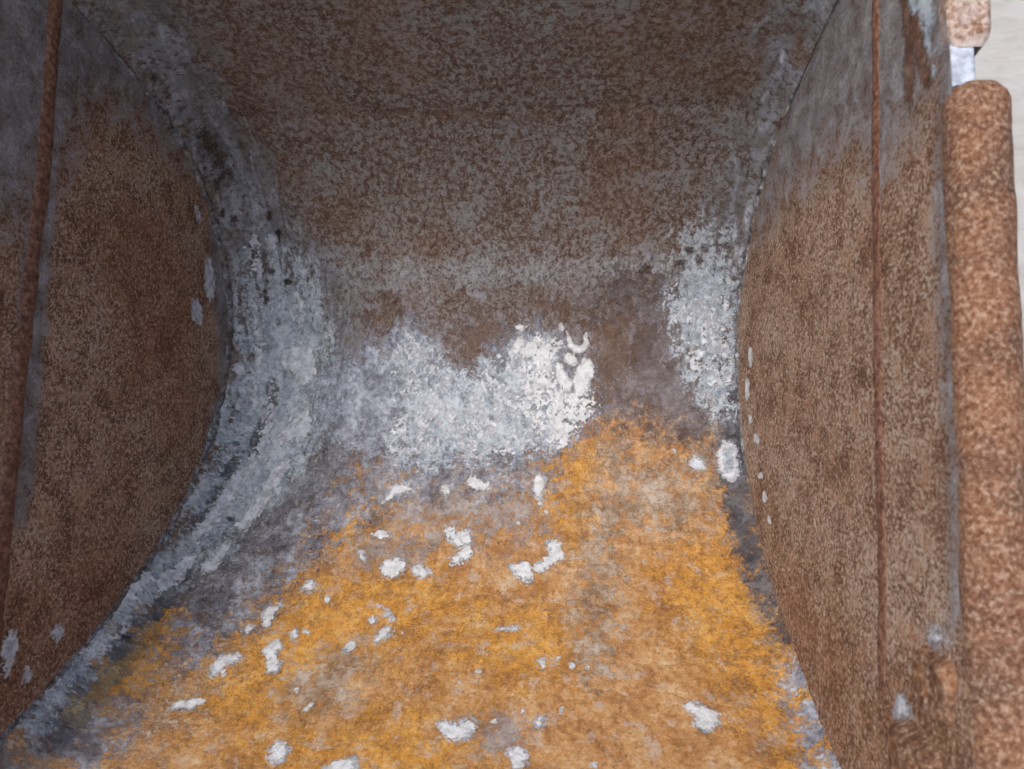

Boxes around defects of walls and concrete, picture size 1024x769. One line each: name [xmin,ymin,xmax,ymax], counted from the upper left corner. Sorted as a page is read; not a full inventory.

rust [898,0,933,111]
damp [191,377,280,531]
rust [7,291,834,769]
damp [583,257,841,769]
damp [43,568,191,754]